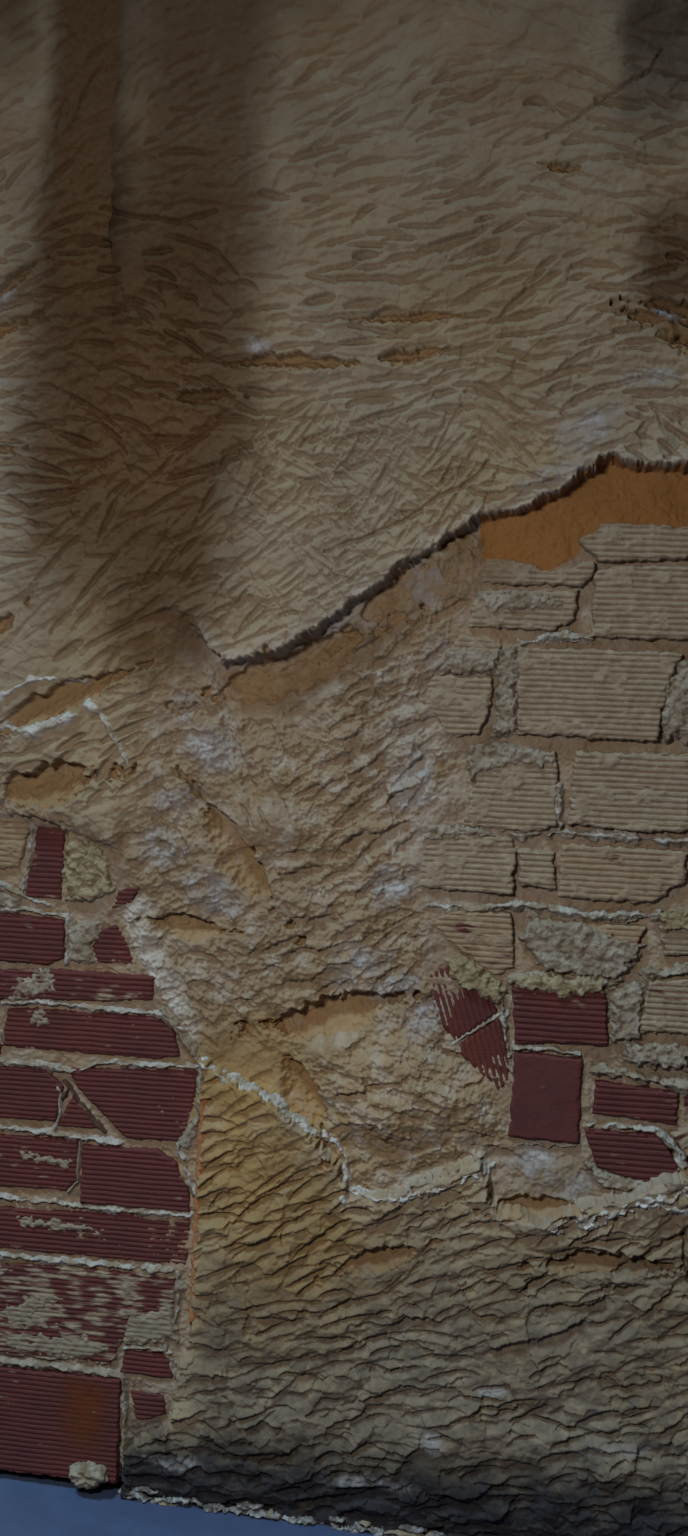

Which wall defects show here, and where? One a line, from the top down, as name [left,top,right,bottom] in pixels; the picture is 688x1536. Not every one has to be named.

spalling [0,454,688,1536]